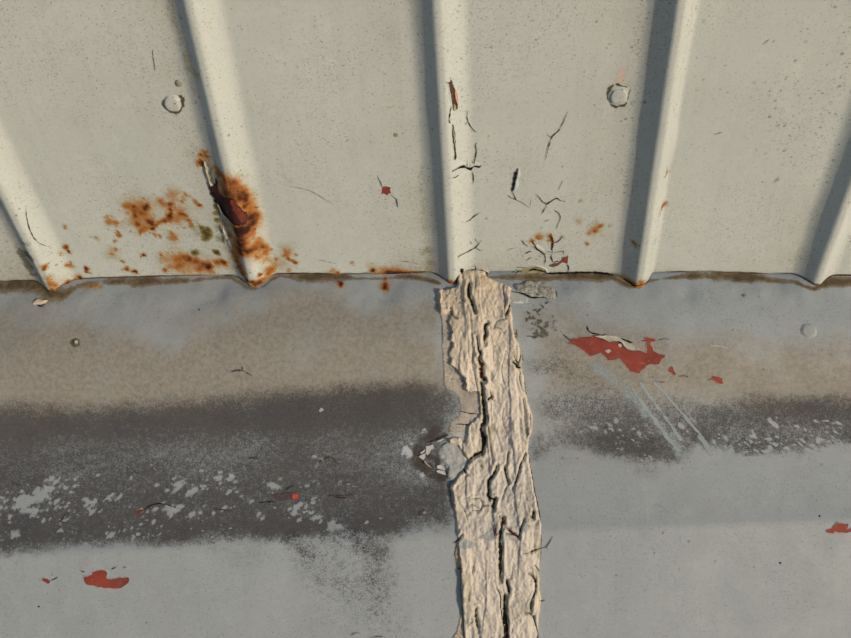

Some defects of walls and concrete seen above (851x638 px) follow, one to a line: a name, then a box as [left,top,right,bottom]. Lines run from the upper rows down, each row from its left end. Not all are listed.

crack [452,113,482,183]
rust [104,215,138,274]
rust [122,150,298,287]
crack [508,168,566,265]
peeling [564,326,688,377]
damp [0,381,459,584]
crack [450,283,553,638]
damp [543,382,851,462]
peeling [825,522,851,534]
peeling [81,567,130,589]